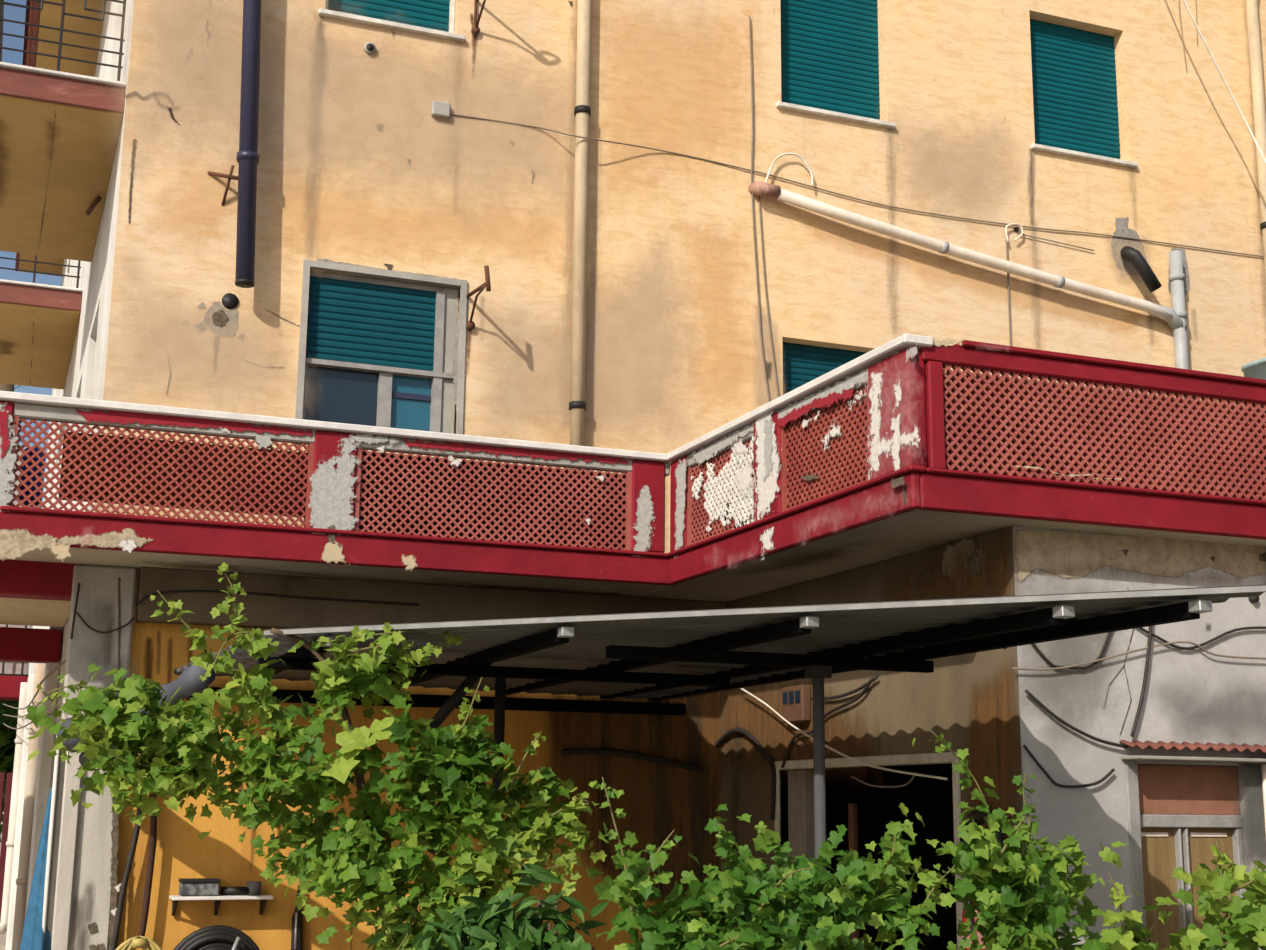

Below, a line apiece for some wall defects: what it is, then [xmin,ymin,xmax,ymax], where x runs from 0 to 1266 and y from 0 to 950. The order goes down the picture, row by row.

crack [124,91,181,125]
crack [128,139,137,224]
flaking render [195,293,244,337]
peeling [933,338,963,347]
peeling [0,402,18,512]
peeling [76,409,313,449]
peeling [674,316,920,560]
spalling [0,528,153,561]
peeling [308,434,628,563]
peeling [632,485,656,557]